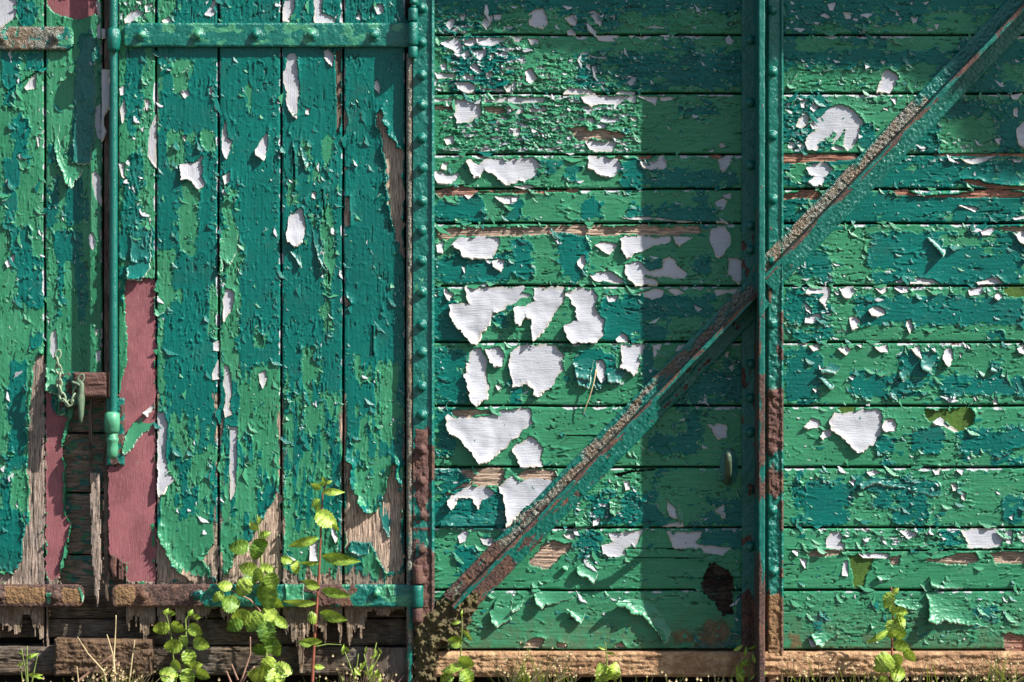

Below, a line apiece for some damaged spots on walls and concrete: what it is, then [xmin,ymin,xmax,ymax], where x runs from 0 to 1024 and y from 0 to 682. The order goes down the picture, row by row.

peeling [783,0,1004,230]
peeling [0,0,409,604]
rust [414,428,430,511]
rust [415,556,432,623]
peeling [435,0,741,596]
peeling [473,352,741,648]
rust [766,388,782,456]
rust [765,592,783,656]
peeling [784,50,1024,651]